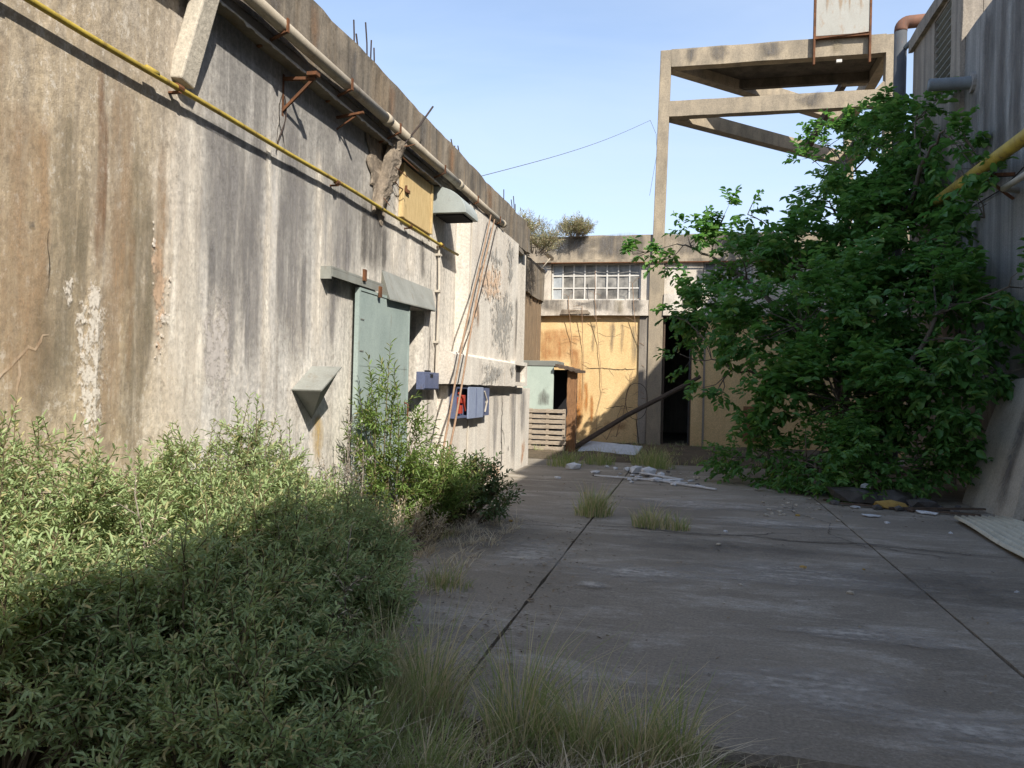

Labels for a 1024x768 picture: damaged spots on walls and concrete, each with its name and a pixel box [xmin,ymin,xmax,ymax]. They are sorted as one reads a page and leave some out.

spalling [366,106,434,226]
leakage [54,207,109,442]
peeling [151,221,174,358]
leakage [210,133,349,356]
leakage [507,238,515,282]